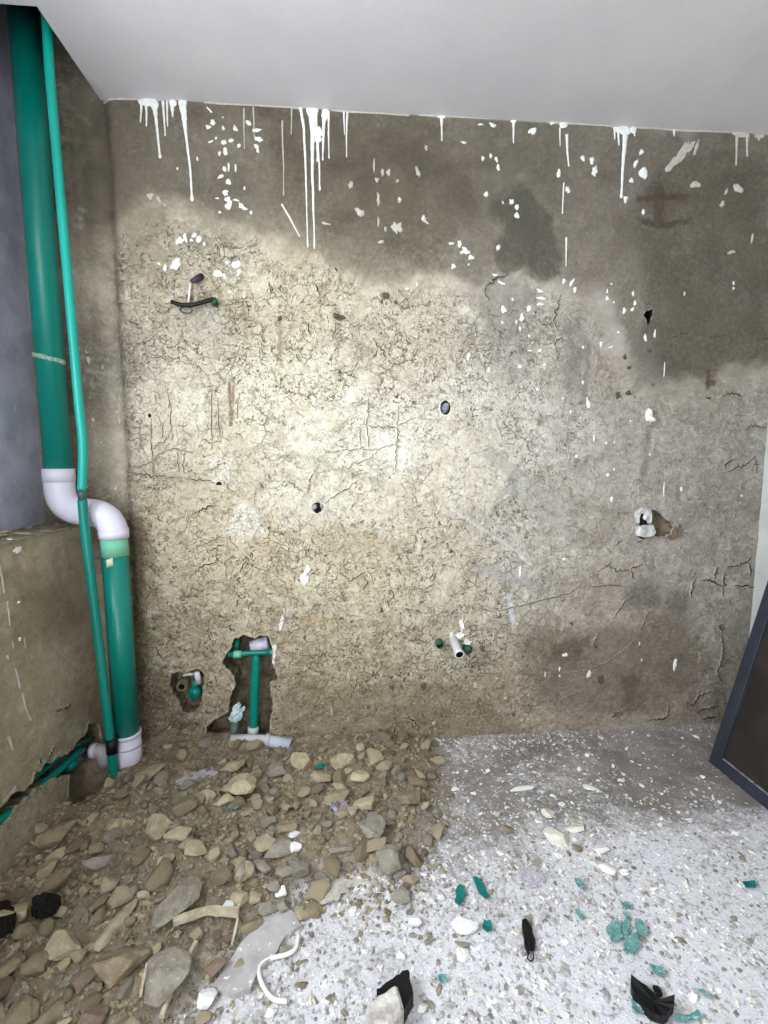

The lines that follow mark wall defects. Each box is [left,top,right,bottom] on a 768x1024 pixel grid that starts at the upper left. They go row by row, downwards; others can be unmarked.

water stain [89,97,768,373]
crack [484,273,508,302]
crack [126,387,239,515]
crack [287,398,413,502]
flaking render [649,508,675,538]
crack [341,572,394,601]
crack [489,538,652,646]
crack [689,556,754,597]
spalling [167,666,206,715]
spalling [204,615,284,735]
crack [649,622,726,722]
spalling [0,718,103,828]